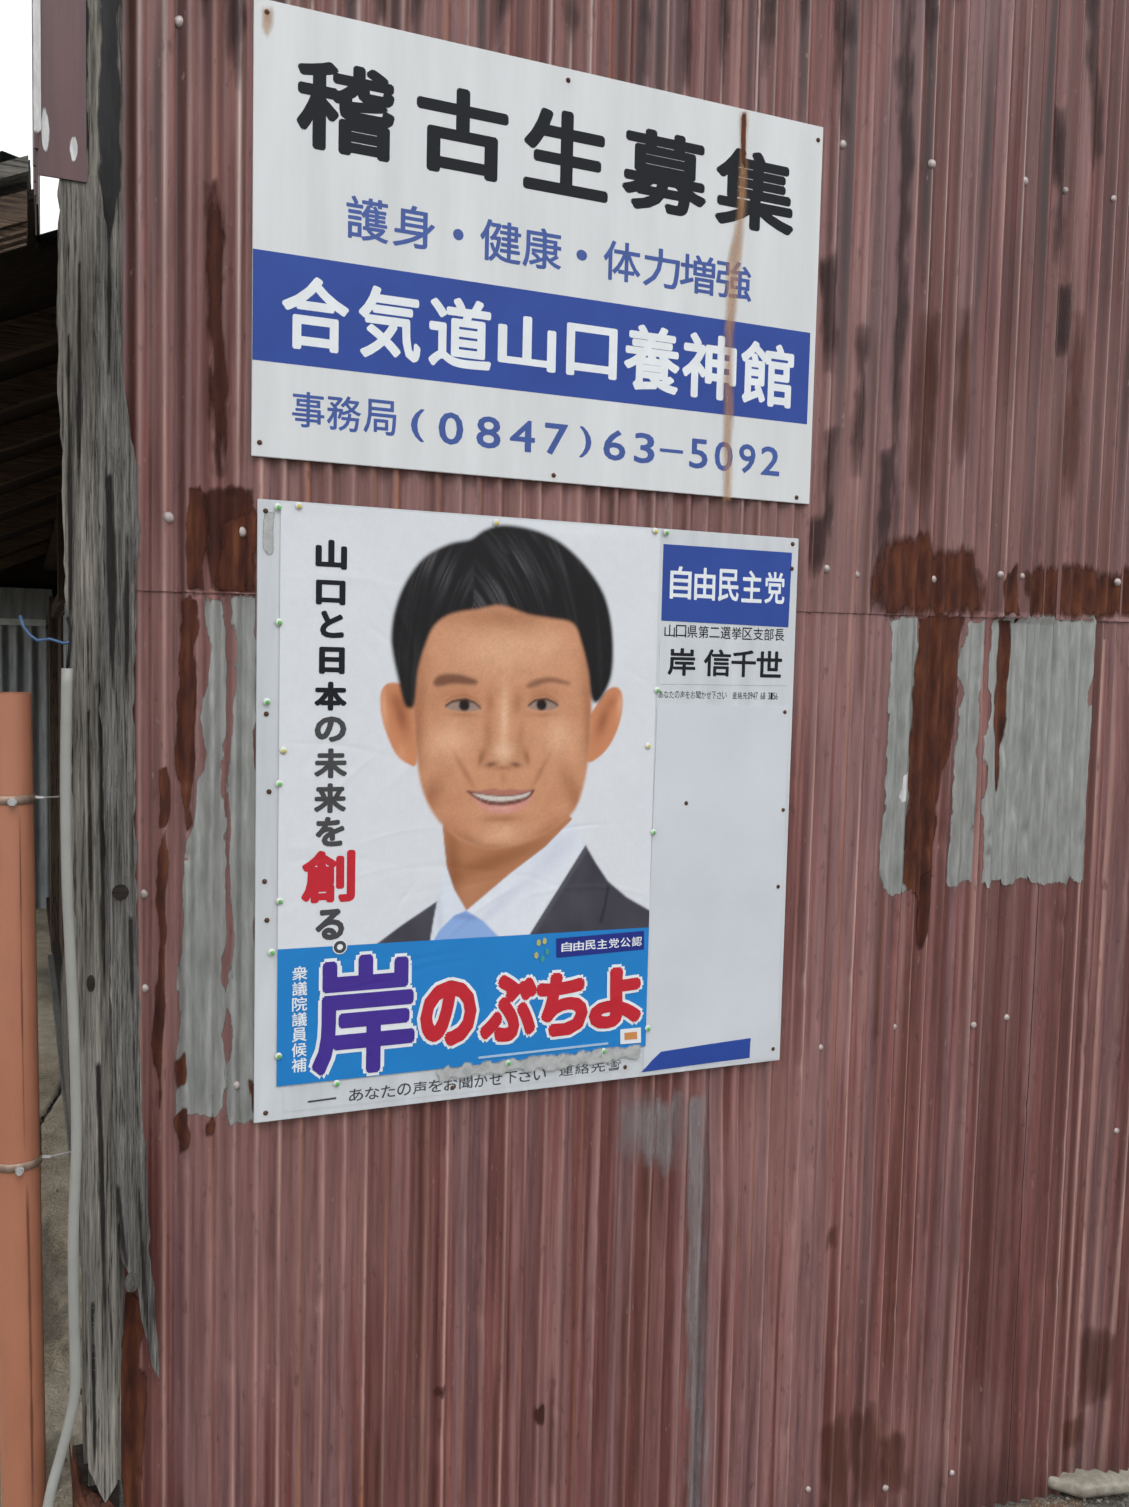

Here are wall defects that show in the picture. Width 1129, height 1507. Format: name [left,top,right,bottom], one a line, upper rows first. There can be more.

rust [725,113,746,496]
peeling [176,594,257,1126]
peeling [879,615,919,896]
rust [871,532,1129,948]
peeling [946,613,1097,888]